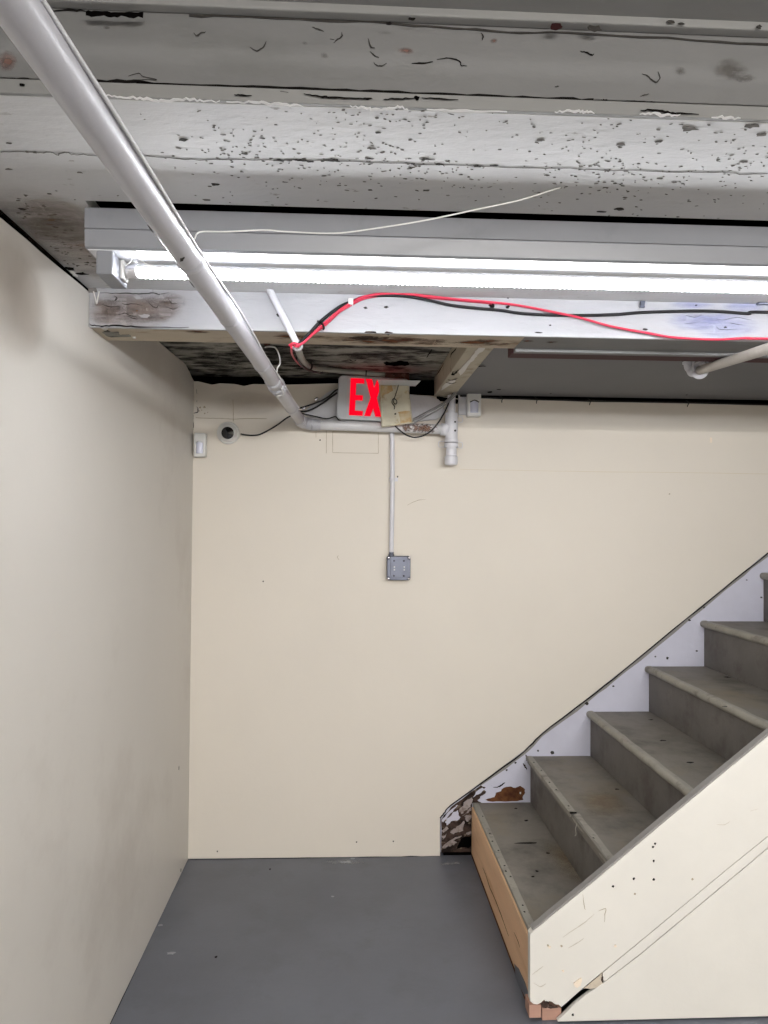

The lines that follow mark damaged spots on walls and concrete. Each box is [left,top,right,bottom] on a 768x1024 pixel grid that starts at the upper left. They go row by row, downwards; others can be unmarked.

peeling [441,750,554,853]